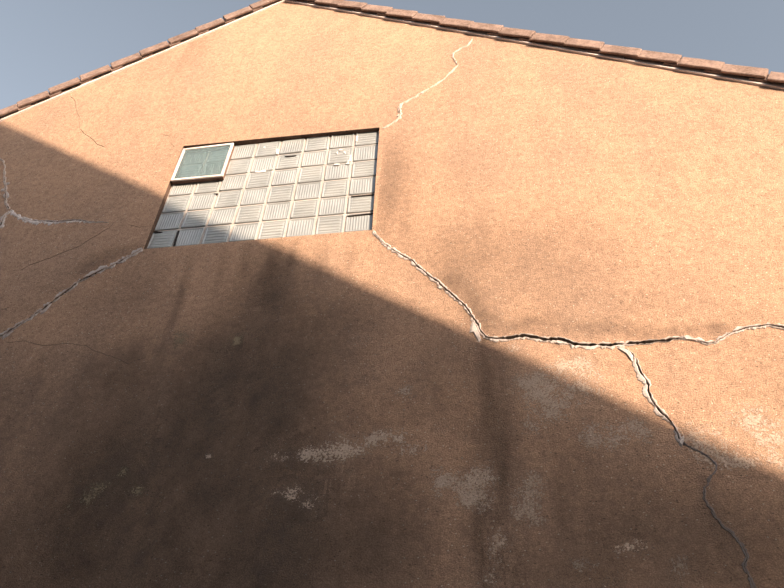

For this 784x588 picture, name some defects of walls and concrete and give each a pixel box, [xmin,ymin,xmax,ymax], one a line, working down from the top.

crack [383,39,473,129]
crack [0,158,114,270]
crack [0,248,143,364]
leakage [83,327,339,588]
crack [372,230,784,588]